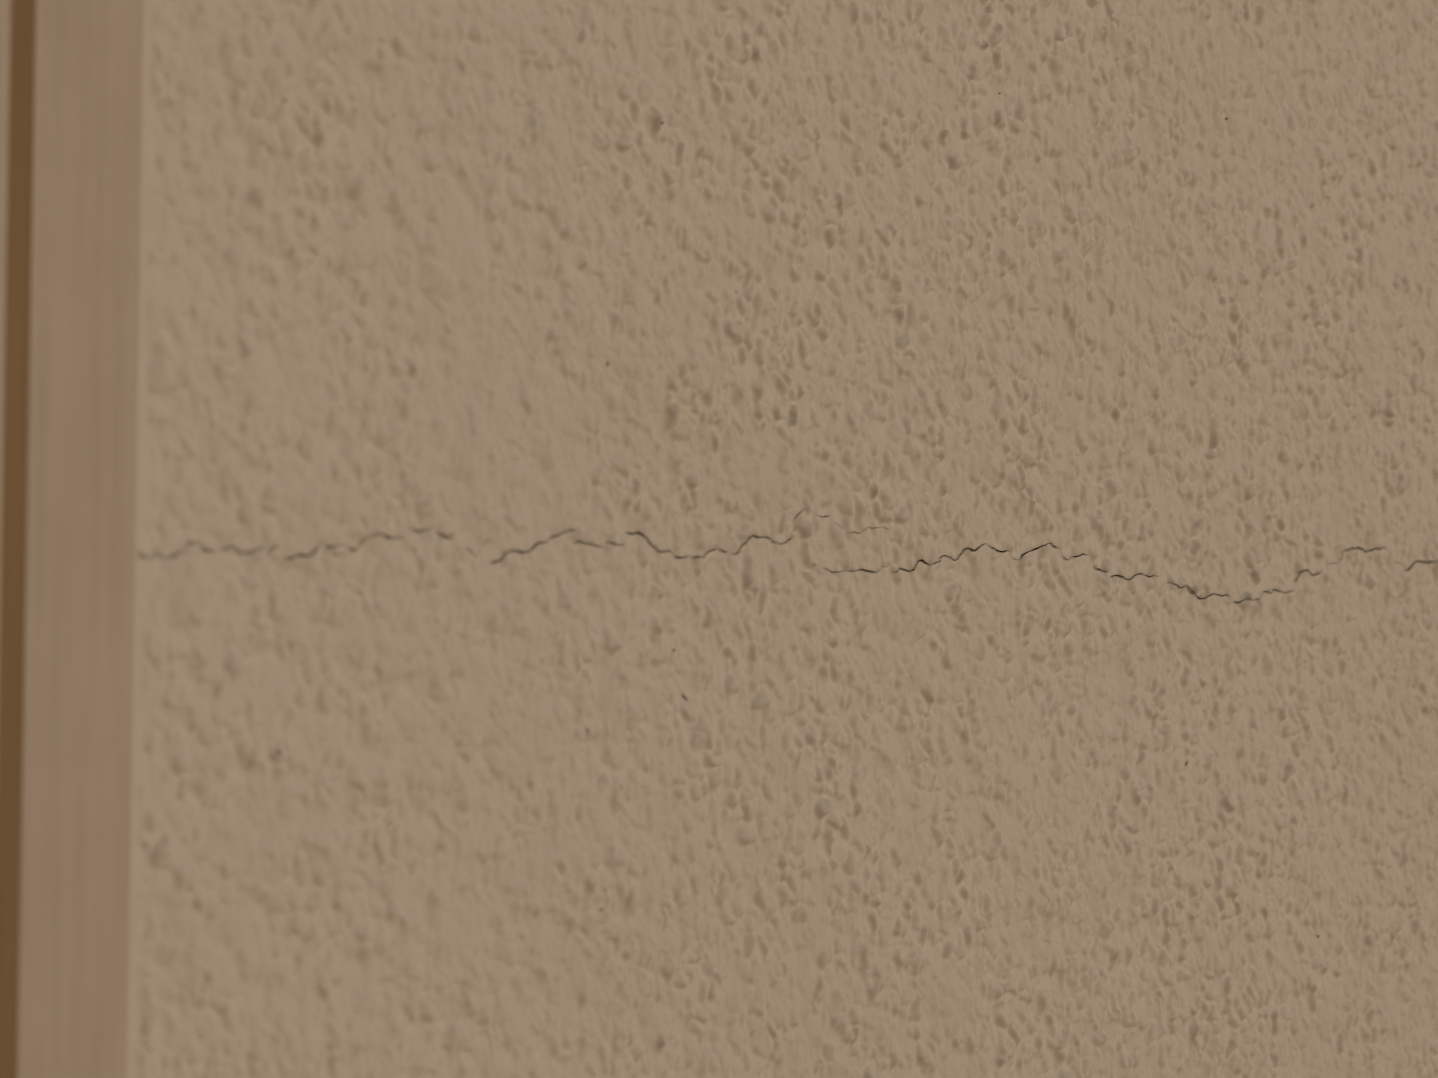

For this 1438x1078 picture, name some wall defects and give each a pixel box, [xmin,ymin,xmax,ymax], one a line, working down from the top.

crack [139,508,1438,603]